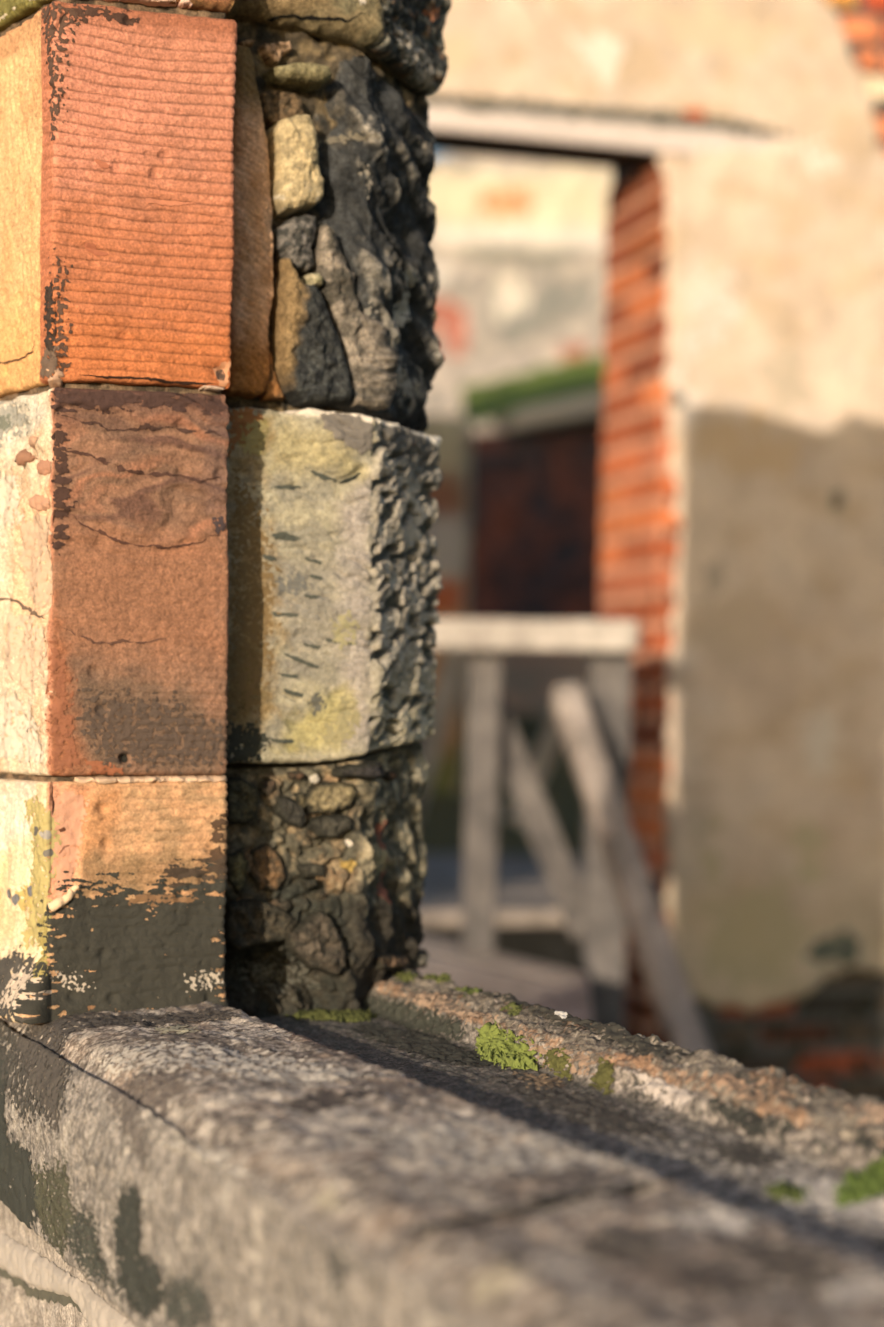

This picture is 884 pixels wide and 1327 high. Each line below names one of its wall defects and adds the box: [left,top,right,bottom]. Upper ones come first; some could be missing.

crack [267,12,364,22]
damp [74,681,271,775]
damp [0,810,260,1327]
crack [410,1179,674,1237]